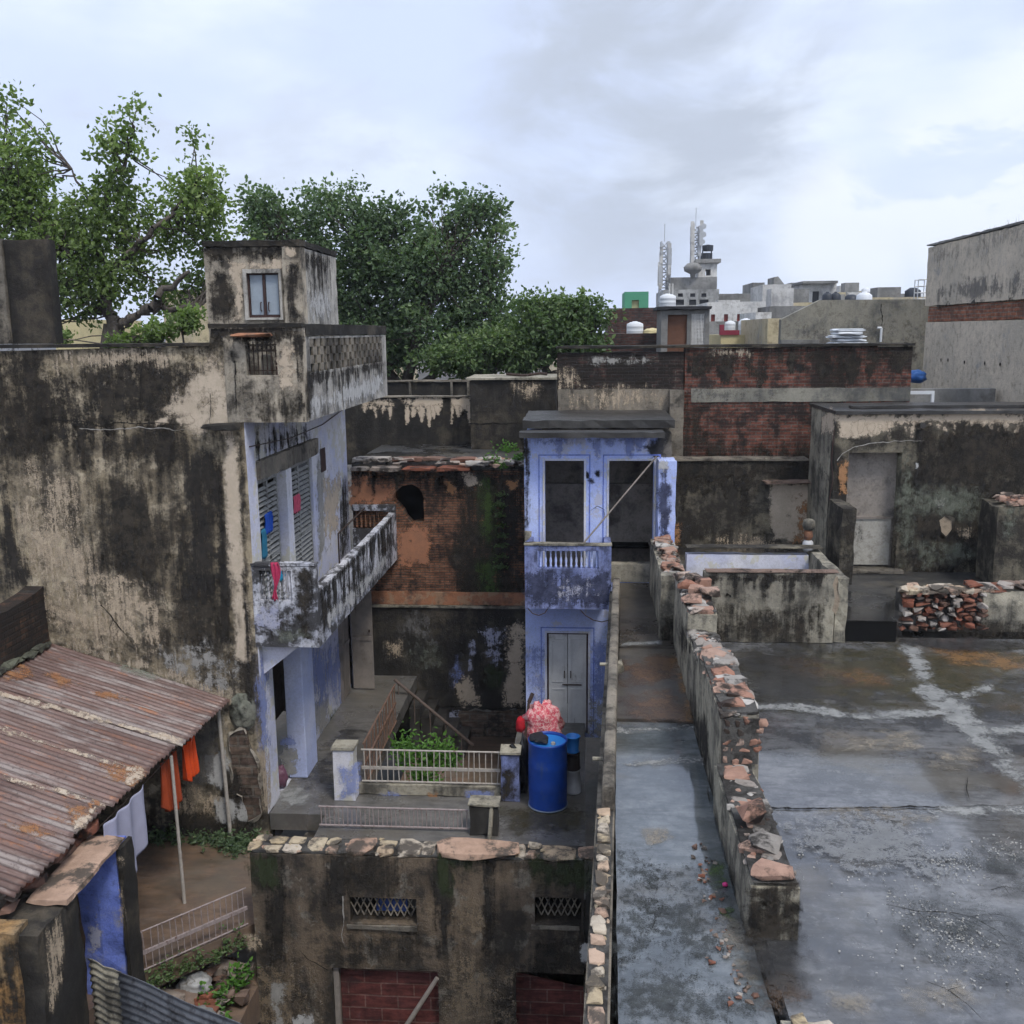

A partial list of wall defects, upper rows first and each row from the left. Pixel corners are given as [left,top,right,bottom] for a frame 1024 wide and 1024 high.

water stain [0,246,612,703]
peeling [310,373,470,427]
water stain [656,324,925,536]
peeling [838,460,849,494]
water stain [892,421,1024,573]
peeling [327,557,387,627]
corrosion [0,664,181,744]
spalling [449,622,545,738]
water stain [709,571,1024,713]
corrosion [4,774,105,825]
corrosion [0,726,146,787]
water stain [482,858,497,956]